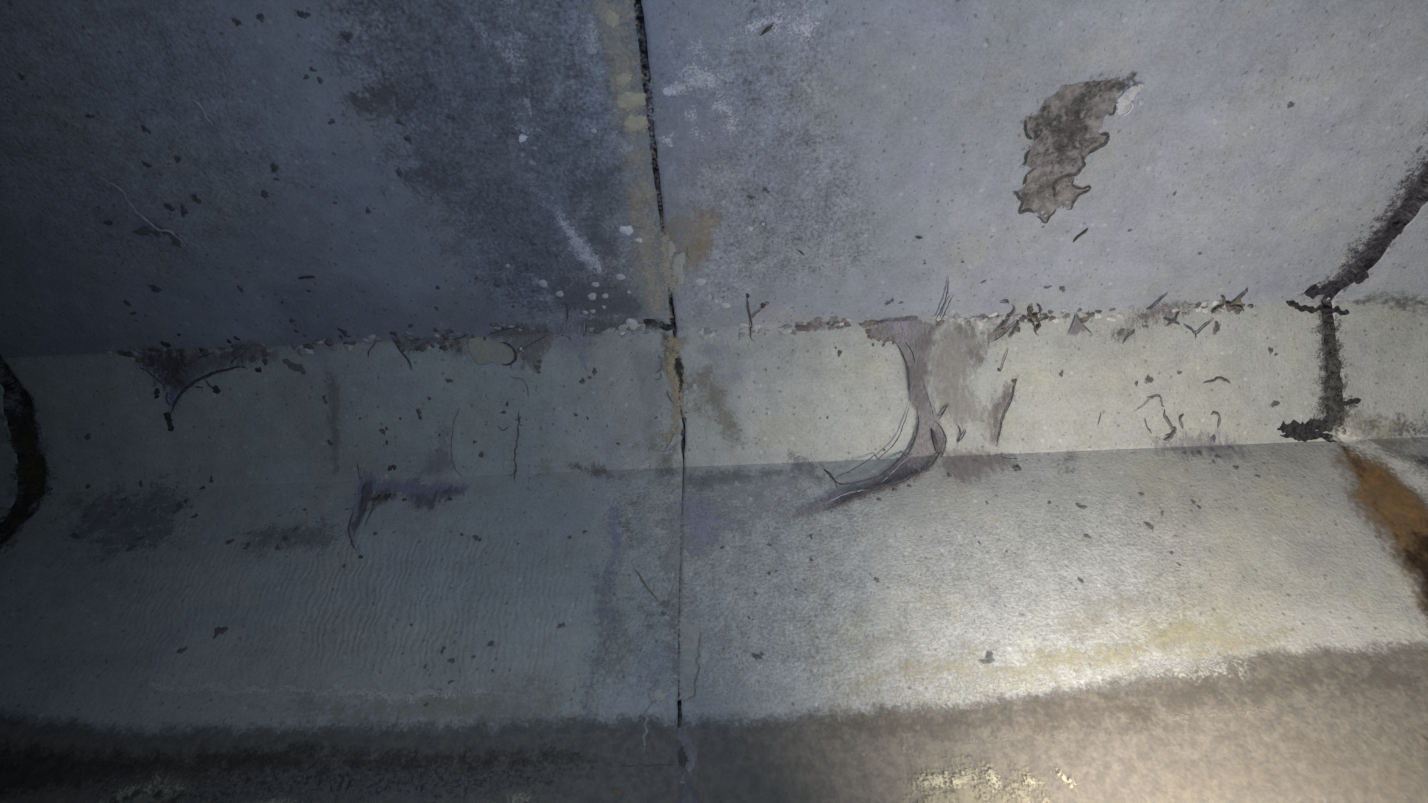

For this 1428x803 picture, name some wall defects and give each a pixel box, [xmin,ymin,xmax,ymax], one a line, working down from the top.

spalling [1014,73,1144,224]
crack [1286,223,1405,316]
crack [1277,398,1361,442]
rust [1338,448,1428,610]
crack [682,630,701,701]